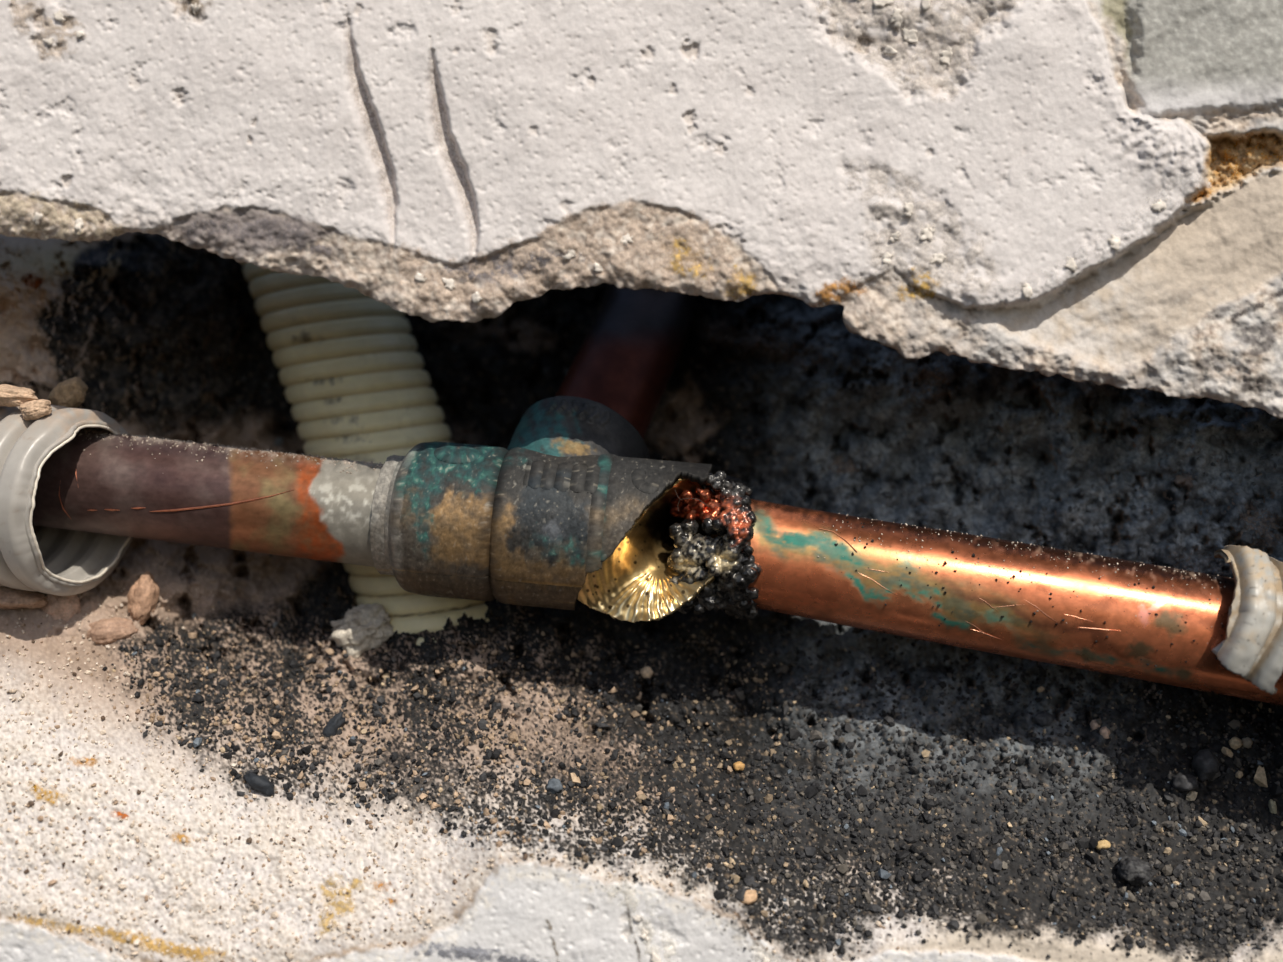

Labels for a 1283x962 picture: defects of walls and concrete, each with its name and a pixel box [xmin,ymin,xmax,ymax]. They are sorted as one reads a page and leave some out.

spalling [818,0,1014,97]
spalling [0,195,123,239]
spalling [398,203,738,318]
spalling [839,166,1211,309]
spalling [1254,766,1277,814]
leakage [424,942,537,962]